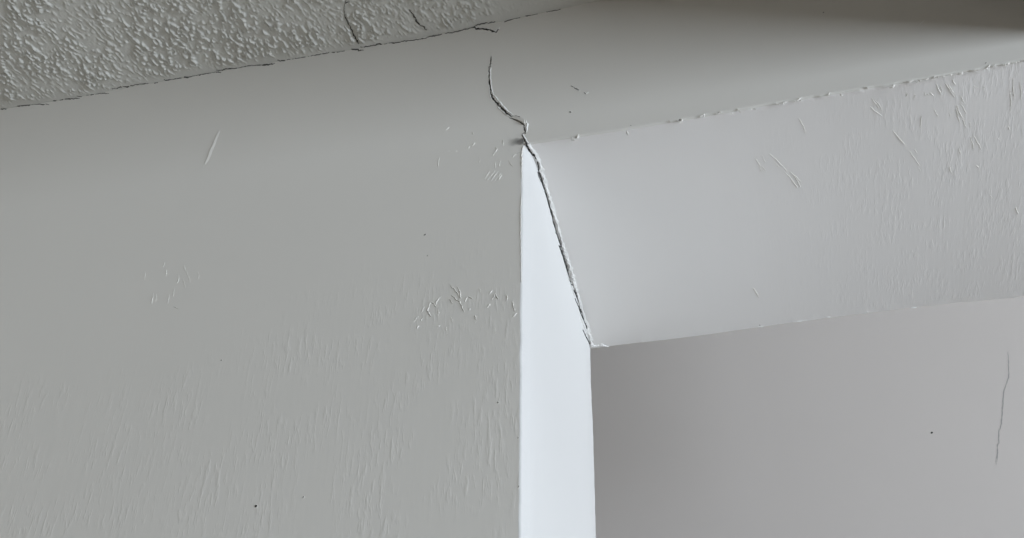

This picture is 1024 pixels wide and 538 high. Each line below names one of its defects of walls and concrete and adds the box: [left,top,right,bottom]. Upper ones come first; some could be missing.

crack [1,1,593,344]
crack [995,355,1009,462]